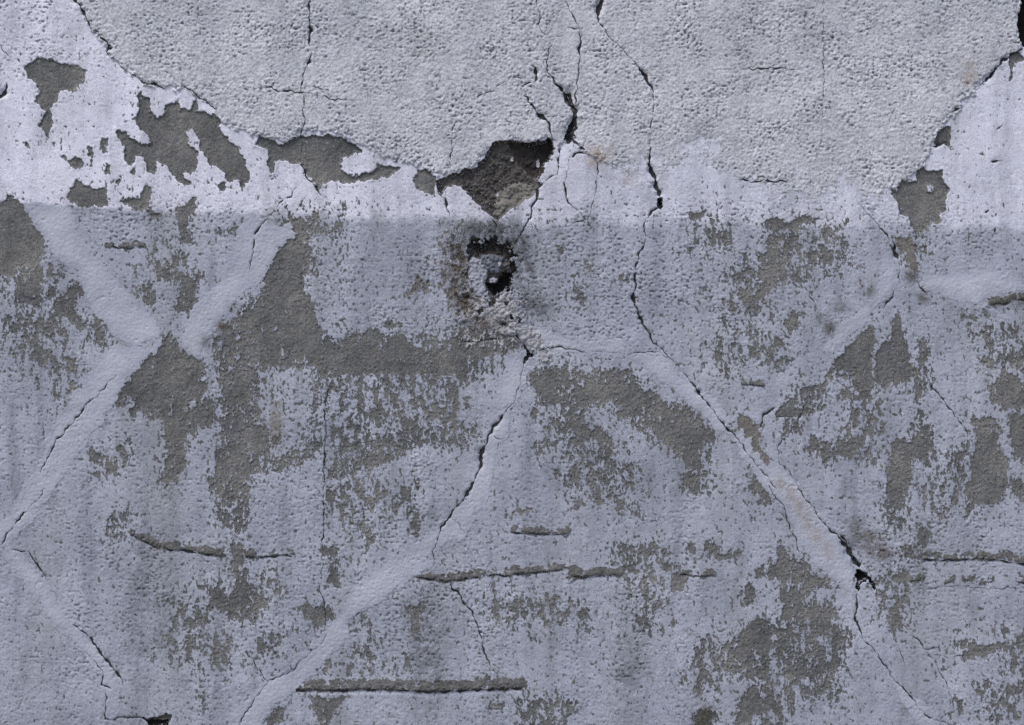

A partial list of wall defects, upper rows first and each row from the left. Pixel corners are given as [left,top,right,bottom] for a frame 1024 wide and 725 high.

peeling [24,57,87,137]
crack [73,0,217,111]
peeling [0,194,114,417]
crack [432,0,861,567]
crack [863,208,926,306]
peeling [891,167,950,273]
crack [0,375,116,578]
peeling [61,91,865,725]
peeling [775,308,1024,633]
crack [72,624,152,721]
crack [450,583,525,719]
crack [854,595,970,725]